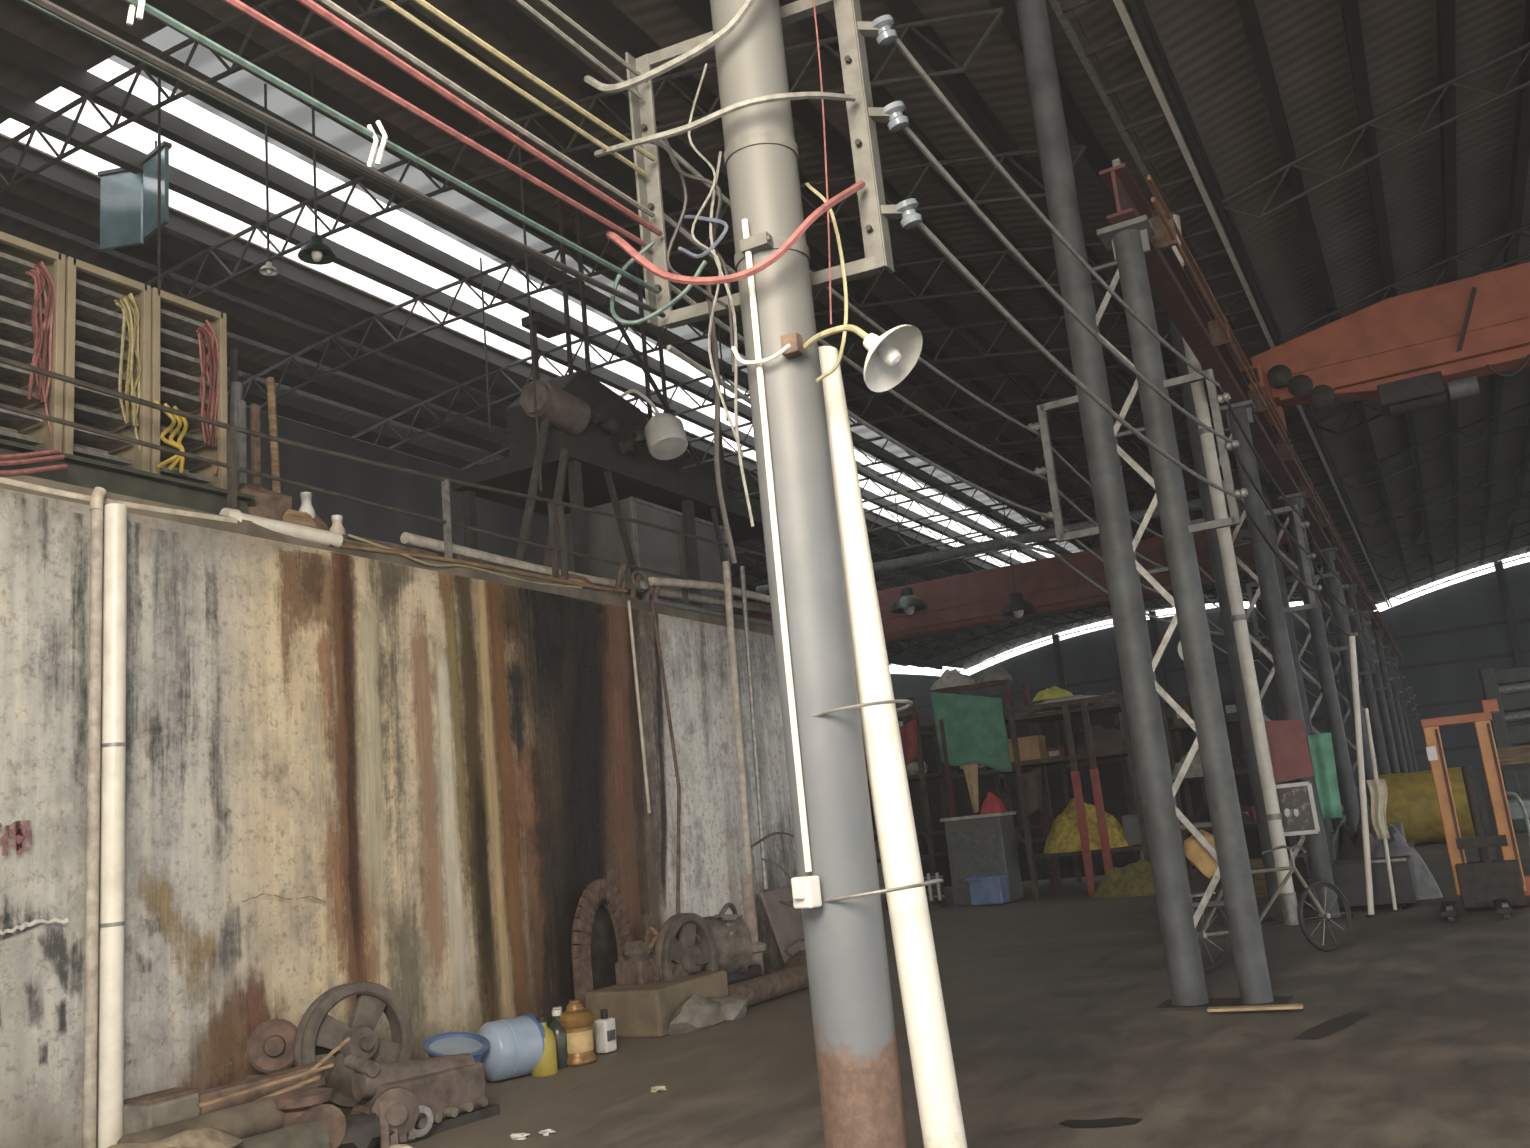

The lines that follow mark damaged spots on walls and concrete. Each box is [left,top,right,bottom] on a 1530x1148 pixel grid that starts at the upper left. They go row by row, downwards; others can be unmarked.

crack [0,917,69,935]
damp [52,513,87,776]
crack [242,893,326,903]
rust [281,550,380,1009]
rust [412,572,544,1022]
damp [505,586,614,1027]